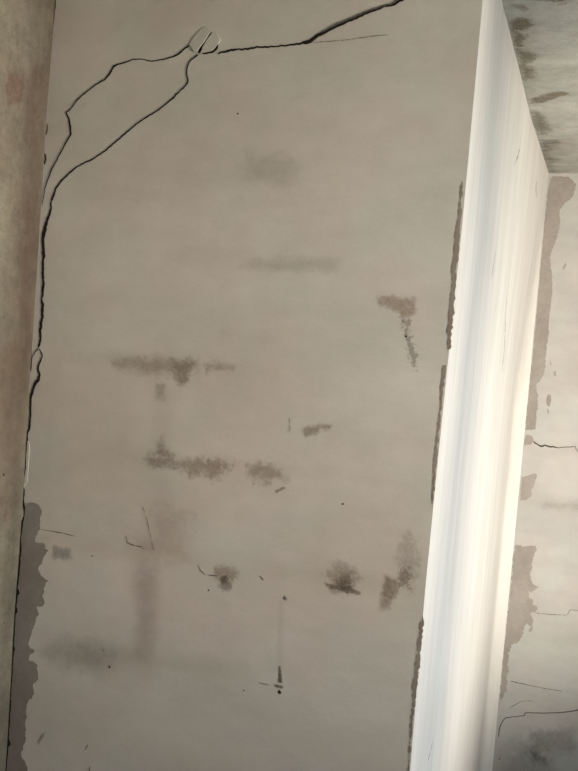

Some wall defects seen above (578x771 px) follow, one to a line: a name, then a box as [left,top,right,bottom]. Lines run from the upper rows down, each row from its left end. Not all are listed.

crack [5,0,404,771]
flaking render [520,473,537,500]
flaking render [524,176,576,446]
flaking render [6,502,48,771]
flaking render [498,545,539,704]
crack [498,681,578,737]